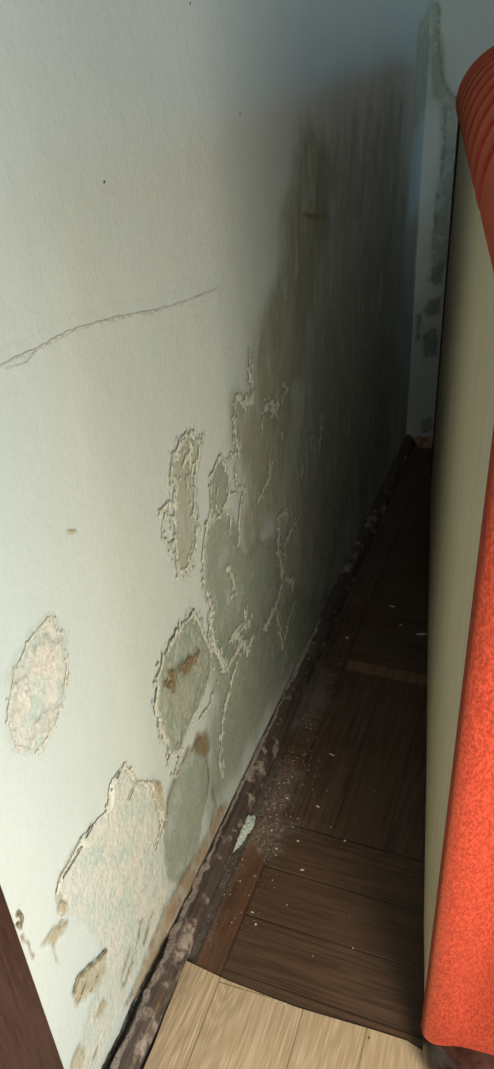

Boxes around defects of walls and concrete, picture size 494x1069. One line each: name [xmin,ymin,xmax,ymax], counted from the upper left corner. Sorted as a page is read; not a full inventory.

damp [415,4,457,285]
damp [157,132,328,884]
peeling [44,618,321,1069]